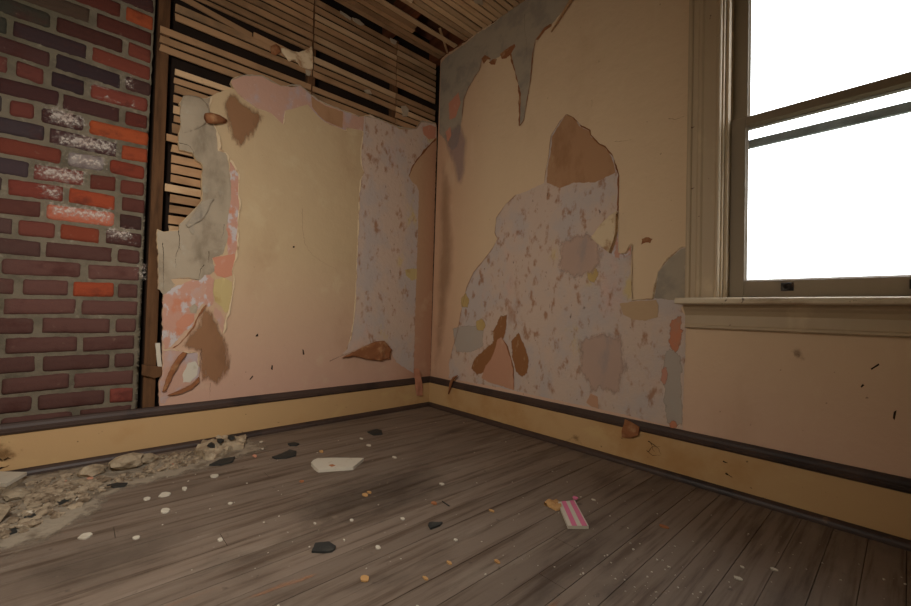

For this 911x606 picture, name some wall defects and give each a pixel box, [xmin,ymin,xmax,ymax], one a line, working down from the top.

spalling [138,0,569,408]
flaking render [654,248,685,300]